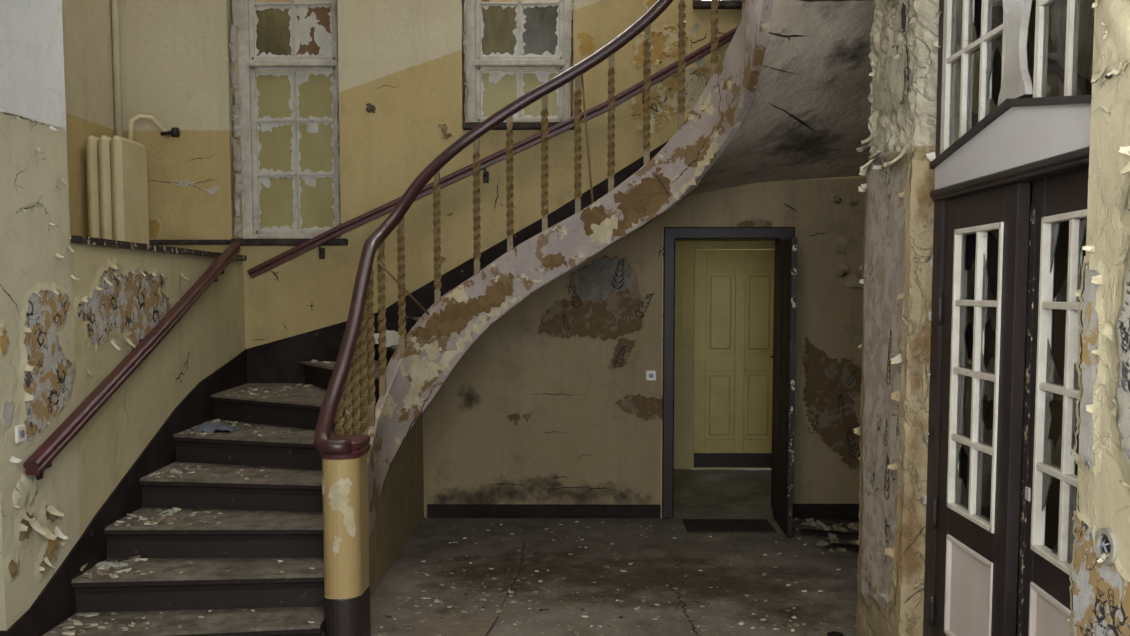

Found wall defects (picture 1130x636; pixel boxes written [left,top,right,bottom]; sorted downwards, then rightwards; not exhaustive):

peeling [463,0,597,122]
peeling [627,23,729,136]
crack [769,32,811,42]
crack [769,103,817,133]
crack [799,0,866,8]
crack [1091,58,1130,85]
peeling [535,137,719,371]
peeling [0,255,179,463]
peeling [403,272,517,412]
peeling [1071,152,1130,498]
peeling [2,498,69,588]
peeling [1066,510,1130,636]